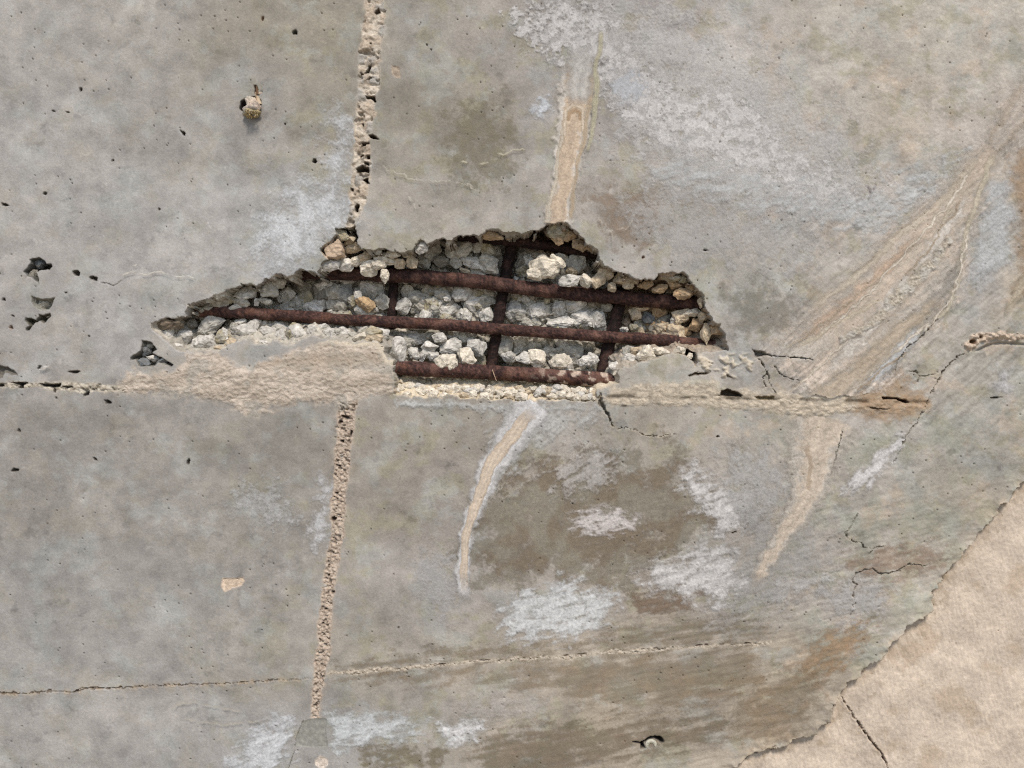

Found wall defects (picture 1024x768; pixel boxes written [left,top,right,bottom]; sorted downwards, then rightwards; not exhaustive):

leakage [499,0,1024,398]
spalling [151,222,729,402]
crack [752,349,813,395]
crack [892,319,966,463]
leakage [324,399,946,768]
crack [844,513,951,607]
crack [0,678,311,726]
crack [824,671,889,768]